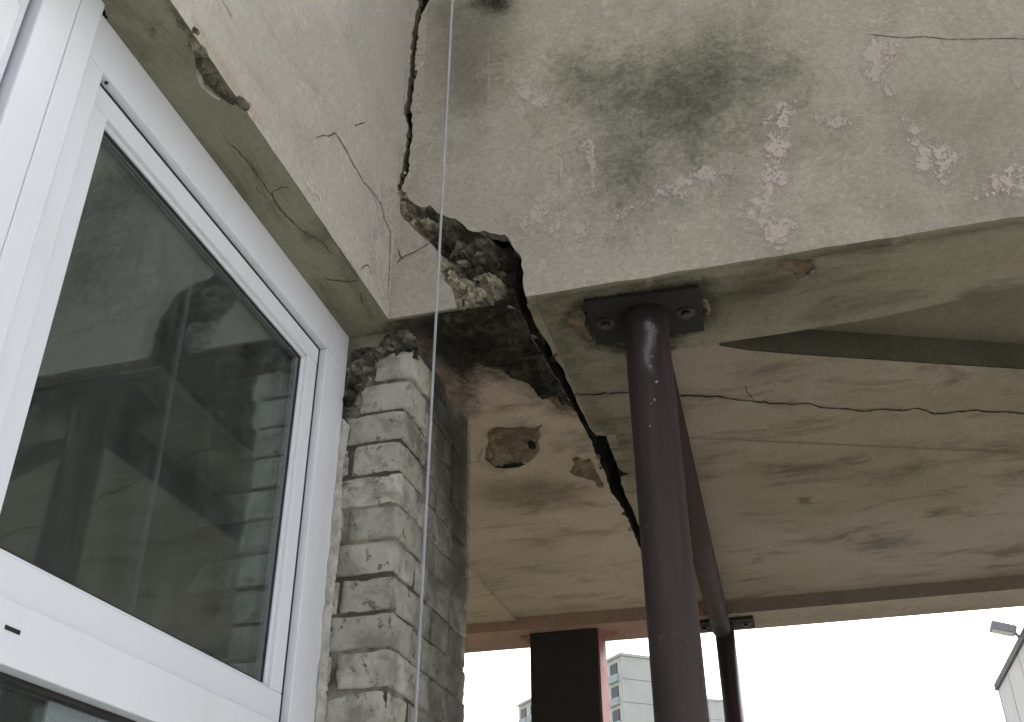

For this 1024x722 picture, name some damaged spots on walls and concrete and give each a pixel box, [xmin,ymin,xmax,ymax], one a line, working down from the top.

spalling [171,9,251,111]
crack [864,33,1020,41]
crack [228,142,338,255]
crack [315,0,429,304]
peeling [742,99,818,282]
peeling [899,115,1024,202]
spalling [398,170,570,411]
spalling [342,330,419,418]
water stain [391,304,573,535]
spalling [478,425,542,469]
crack [514,256,641,544]
crack [680,386,1024,415]